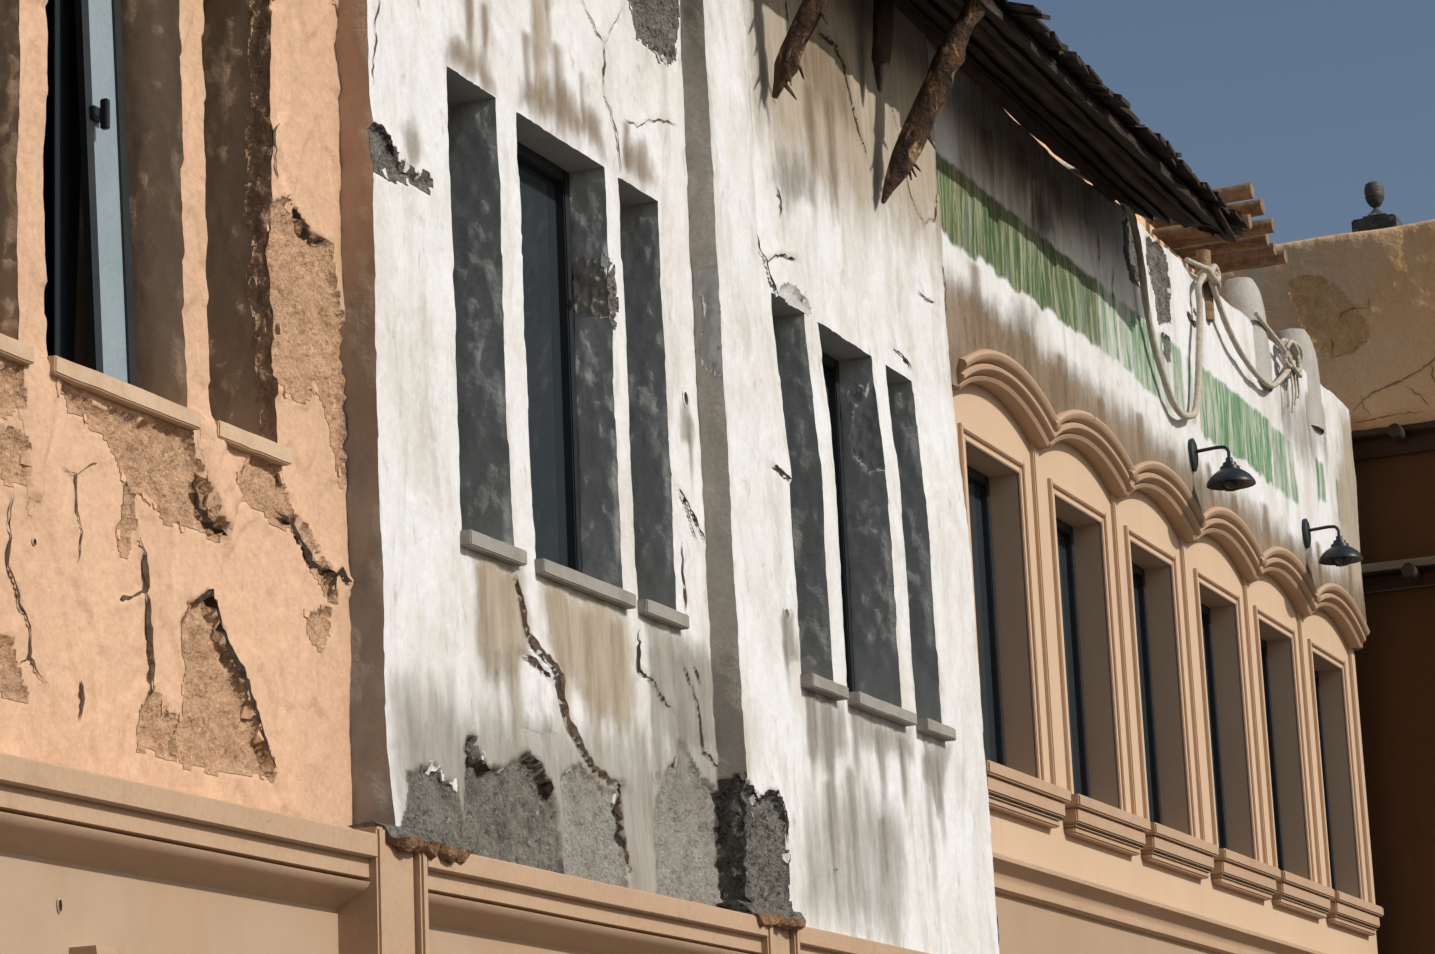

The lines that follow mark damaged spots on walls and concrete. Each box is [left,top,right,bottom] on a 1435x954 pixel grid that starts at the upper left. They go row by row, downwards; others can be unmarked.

crack [583,2,675,168]
spalling [628,0,680,65]
spalling [243,0,348,489]
spalling [55,377,231,559]
crack [1354,357,1435,423]
crack [7,498,85,720]
spalling [136,587,277,783]
crack [465,736,491,773]
spalling [401,735,628,888]
crack [515,569,632,870]
spalling [654,738,793,911]
water stain [808,690,946,915]